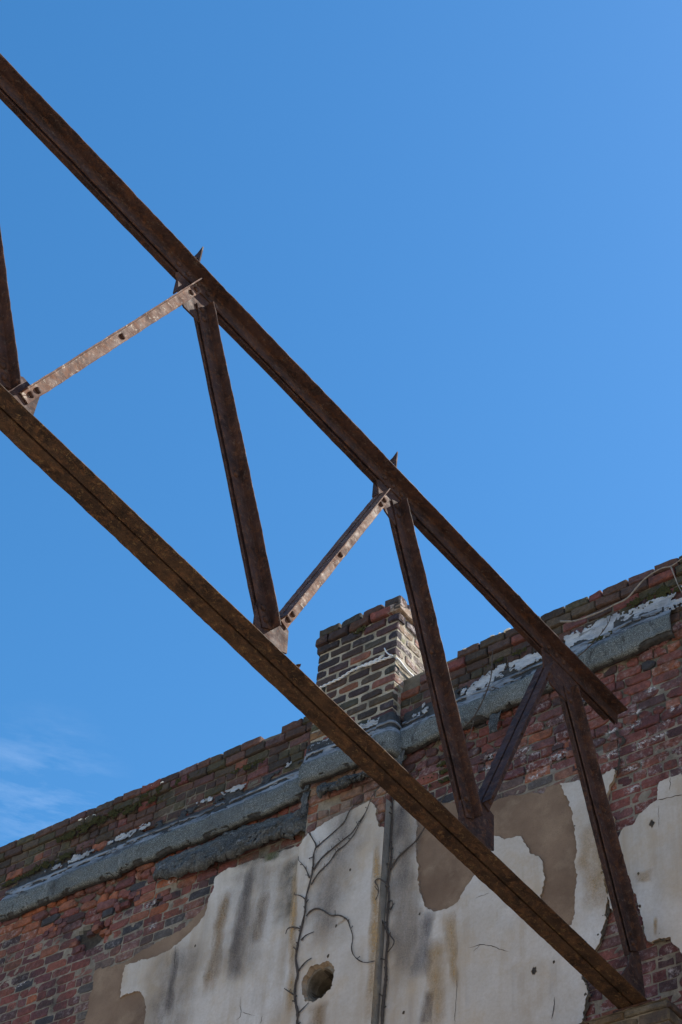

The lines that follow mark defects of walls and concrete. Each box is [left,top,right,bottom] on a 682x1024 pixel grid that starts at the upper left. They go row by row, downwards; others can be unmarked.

peeling [44,849,94,872]
peeling [107,822,150,845]
peeling [196,783,246,804]
peeling [416,821,474,915]
peeling [439,801,458,819]
peeling [490,784,578,925]
spalling [69,888,172,953]
peeling [84,902,208,1024]
leakage [207,899,228,978]
spalling [302,954,335,1002]
flaking render [581,976,592,1021]
flaking render [596,866,610,950]